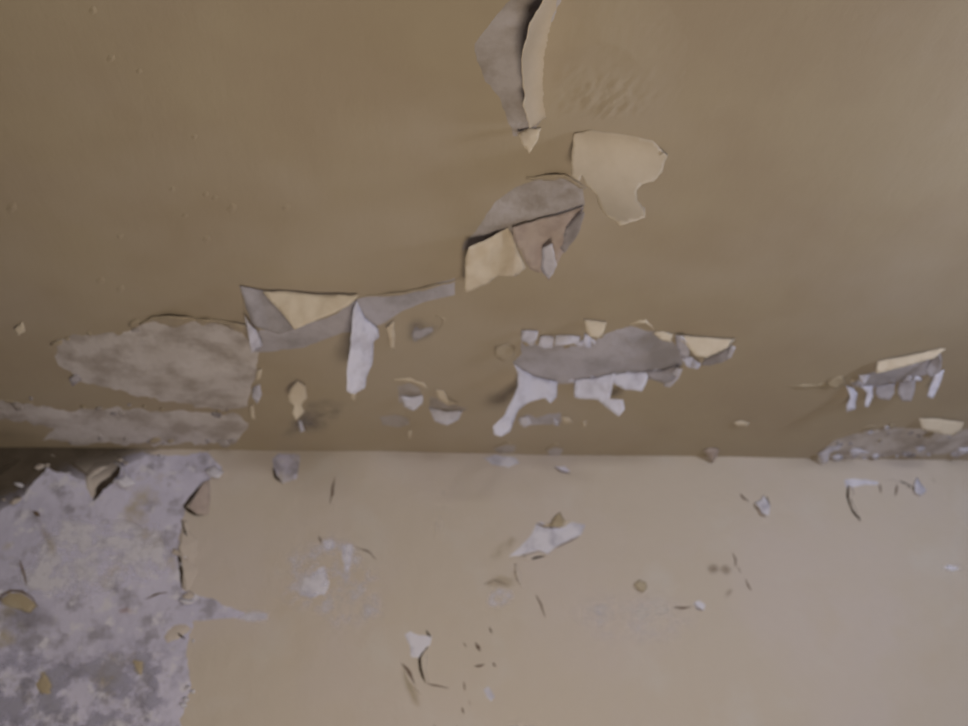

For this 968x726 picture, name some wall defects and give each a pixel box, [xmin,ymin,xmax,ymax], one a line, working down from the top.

peeling [475,0,561,154]
peeling [0,129,668,726]
peeling [493,319,736,437]
peeling [786,348,945,412]
peeling [817,418,968,464]